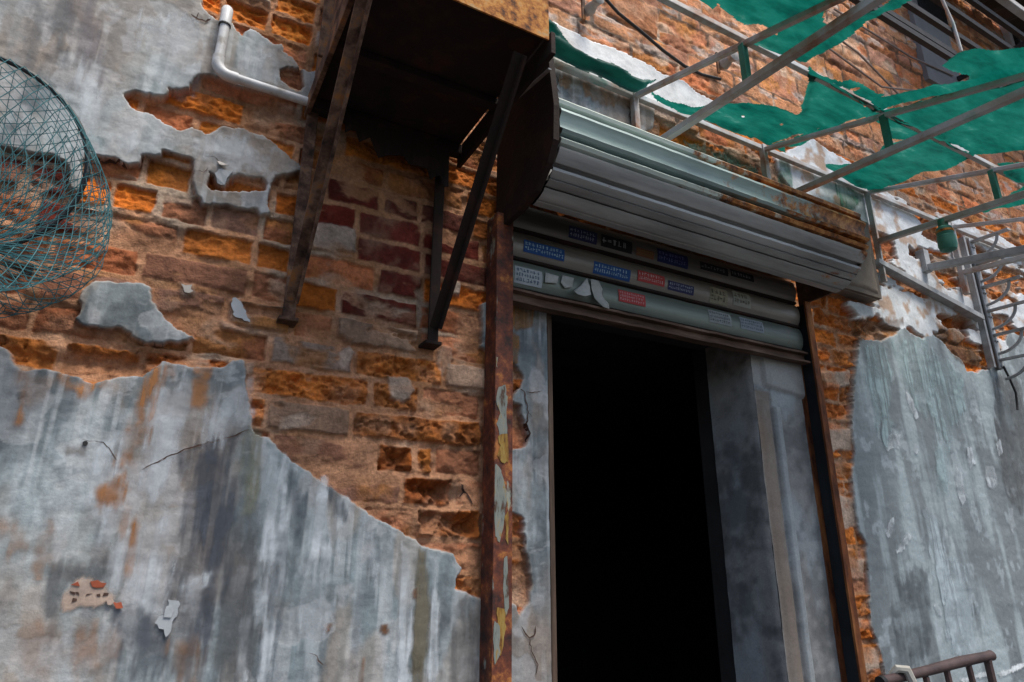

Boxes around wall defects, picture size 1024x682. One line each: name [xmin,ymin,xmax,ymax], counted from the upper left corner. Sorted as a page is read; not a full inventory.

leakage [144,417,183,498]
crack [142,429,249,470]
spalling [0,0,533,664]
crack [516,387,540,442]
spalling [648,109,1024,682]
leakage [865,337,966,487]
leakage [993,375,1024,508]
leakage [47,531,129,614]
leakage [180,443,350,682]
leakage [398,549,439,682]
crack [522,626,538,673]
leakage [900,518,970,659]